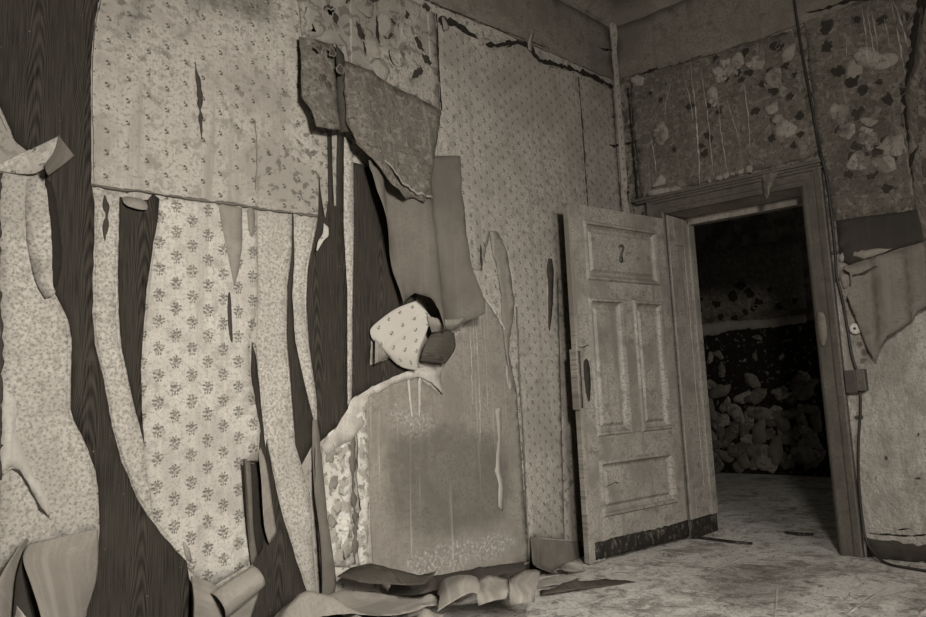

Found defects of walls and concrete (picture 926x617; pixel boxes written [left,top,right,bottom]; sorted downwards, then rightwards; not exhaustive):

peeling [297,0,614,110]
peeling [630,0,912,221]
flaking render [322,294,529,597]